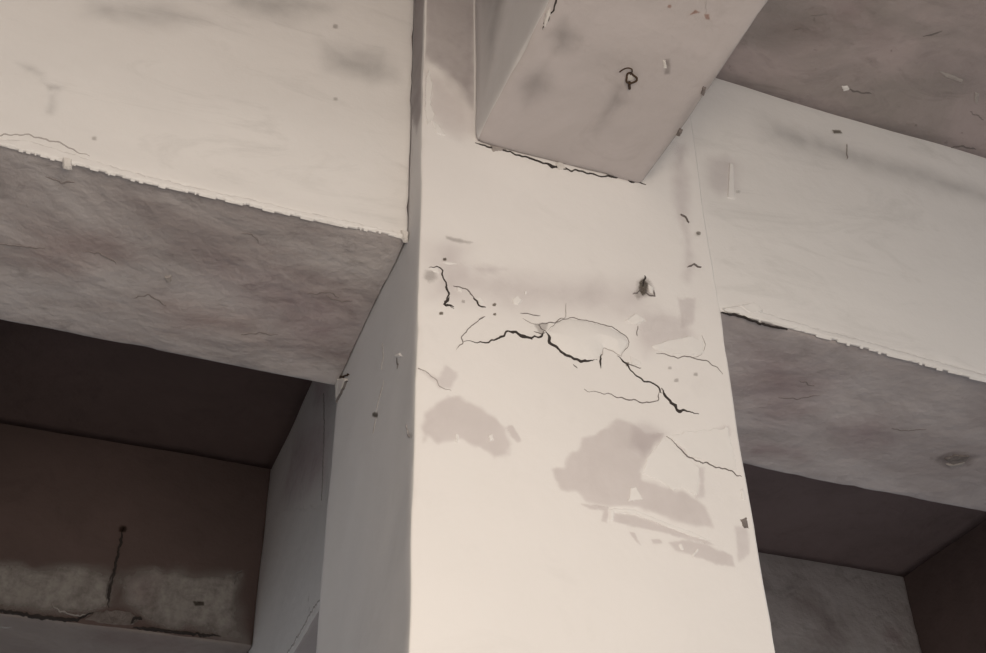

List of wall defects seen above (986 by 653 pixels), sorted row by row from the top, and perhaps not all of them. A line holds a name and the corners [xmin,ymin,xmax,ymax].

crack [429,258,723,414]
crack [106,527,126,607]
spalling [0,609,220,638]